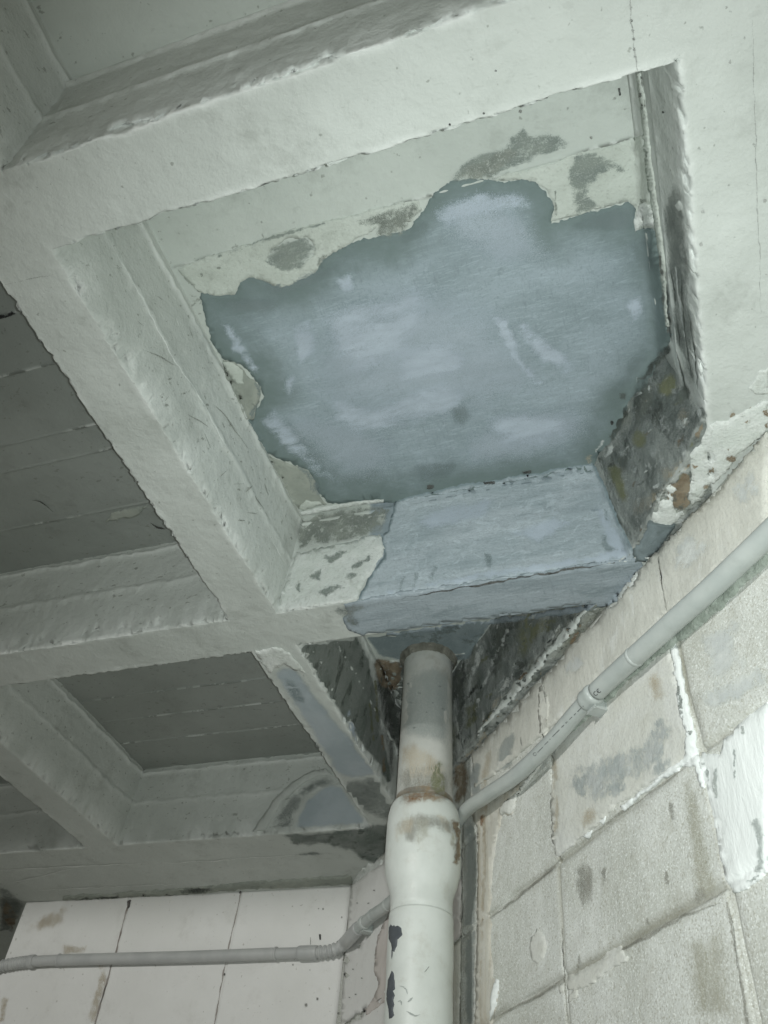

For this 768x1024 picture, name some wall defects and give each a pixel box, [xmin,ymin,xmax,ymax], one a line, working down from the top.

peeling [223,360,262,420]
peeling [178,200,422,296]
peeling [453,72,671,336]
water stain [572,181,704,537]
peeling [466,400,768,794]
water stain [272,605,581,863]
water stain [573,860,606,906]
peeling [472,644,768,1024]